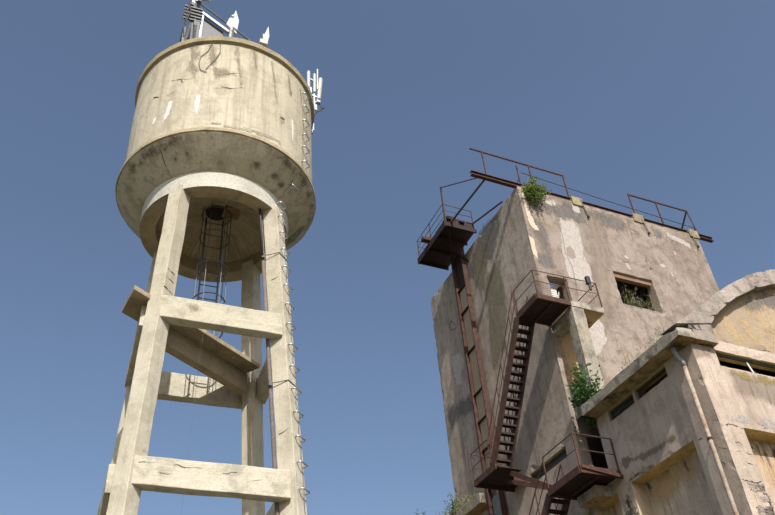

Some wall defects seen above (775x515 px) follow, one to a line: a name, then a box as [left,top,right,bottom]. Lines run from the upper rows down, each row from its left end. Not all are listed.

flaking render [559,204,594,285]
leakage [746,293,775,310]
spalling [747,481,775,515]